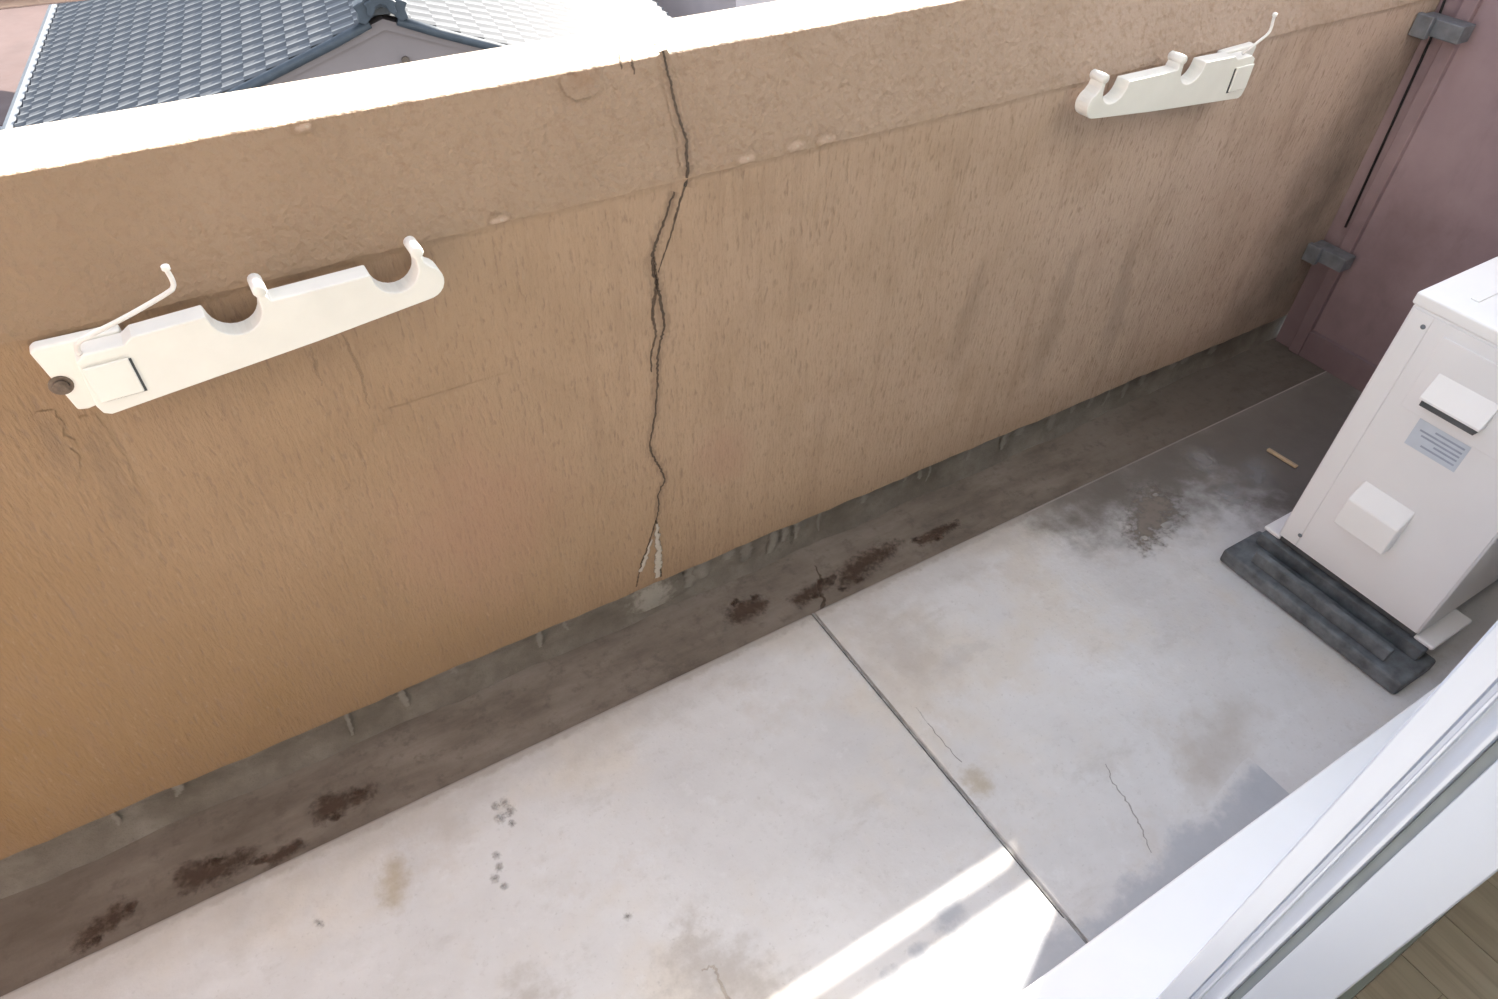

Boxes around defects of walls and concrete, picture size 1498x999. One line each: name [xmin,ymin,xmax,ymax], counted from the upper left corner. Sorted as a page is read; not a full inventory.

crack [618,23,698,587]